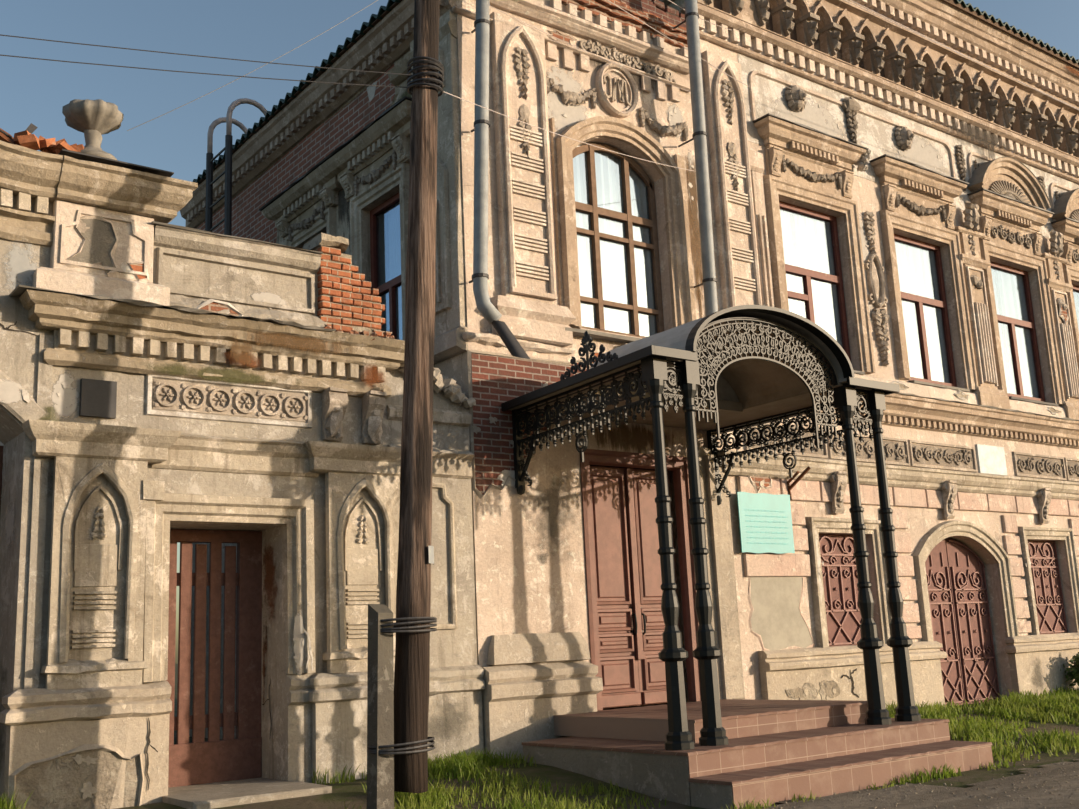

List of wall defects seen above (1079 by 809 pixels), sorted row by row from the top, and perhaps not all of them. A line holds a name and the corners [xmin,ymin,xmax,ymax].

crack [0,321,37,336]
peeling [0,379,30,404]
damp [538,483,567,538]
rust [262,547,277,684]